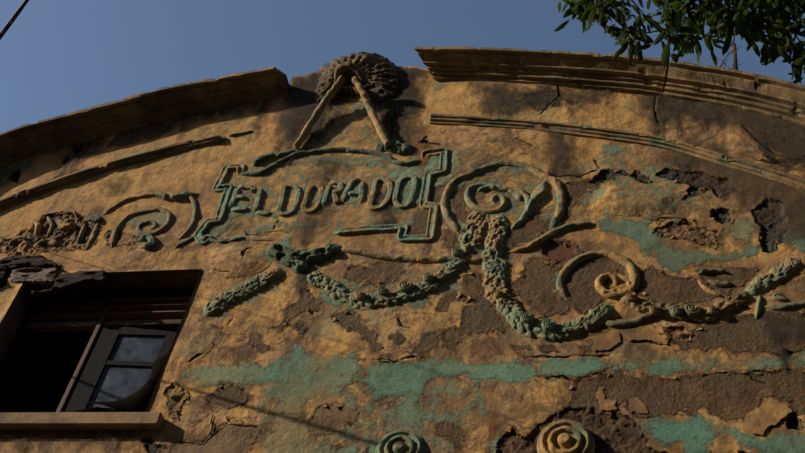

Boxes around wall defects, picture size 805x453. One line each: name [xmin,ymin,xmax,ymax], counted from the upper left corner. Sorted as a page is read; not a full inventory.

damp [468,81,612,118]
spalling [0,211,137,257]
spalling [560,167,734,249]
spalling [751,201,789,253]
spalling [163,382,190,420]
peeling [200,380,247,409]
peeling [496,368,805,453]